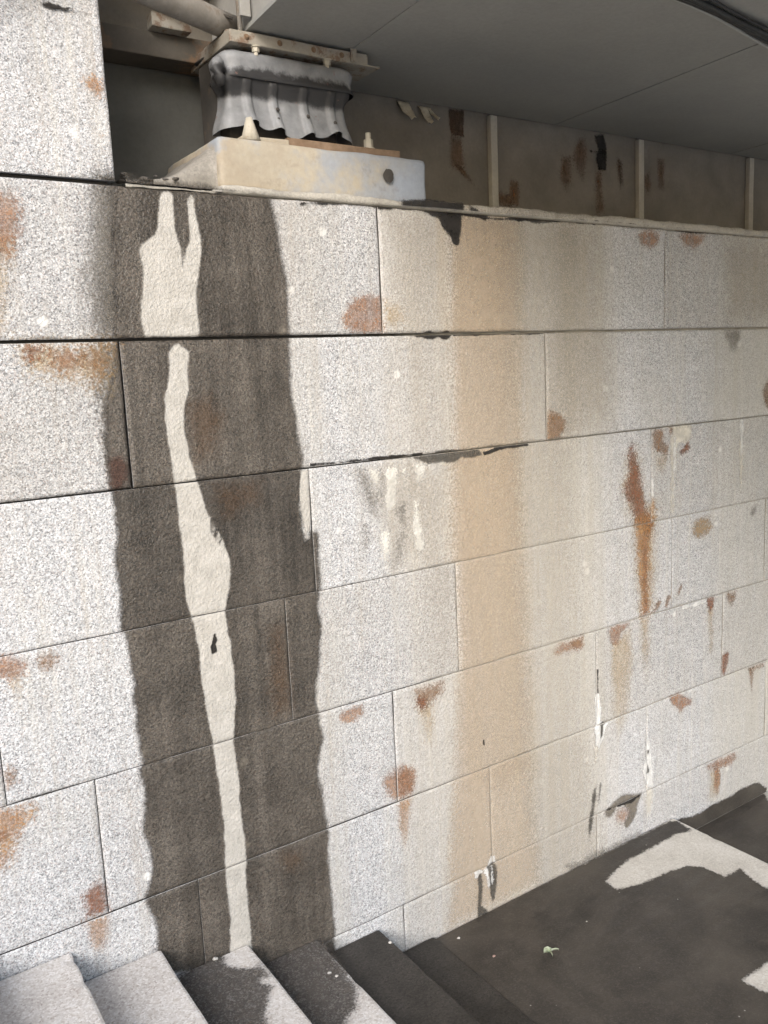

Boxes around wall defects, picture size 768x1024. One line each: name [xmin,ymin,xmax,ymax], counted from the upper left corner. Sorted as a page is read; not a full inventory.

rust [449,109,468,178]
rust [342,295,385,334]
rust [22,344,118,382]
rust [547,411,565,440]
rust [624,443,682,614]
damp [98,173,542,1024]
rust [417,682,444,710]
rust [670,693,692,711]
rust [708,754,734,788]
rust [382,766,416,824]
spalling [605,794,641,828]